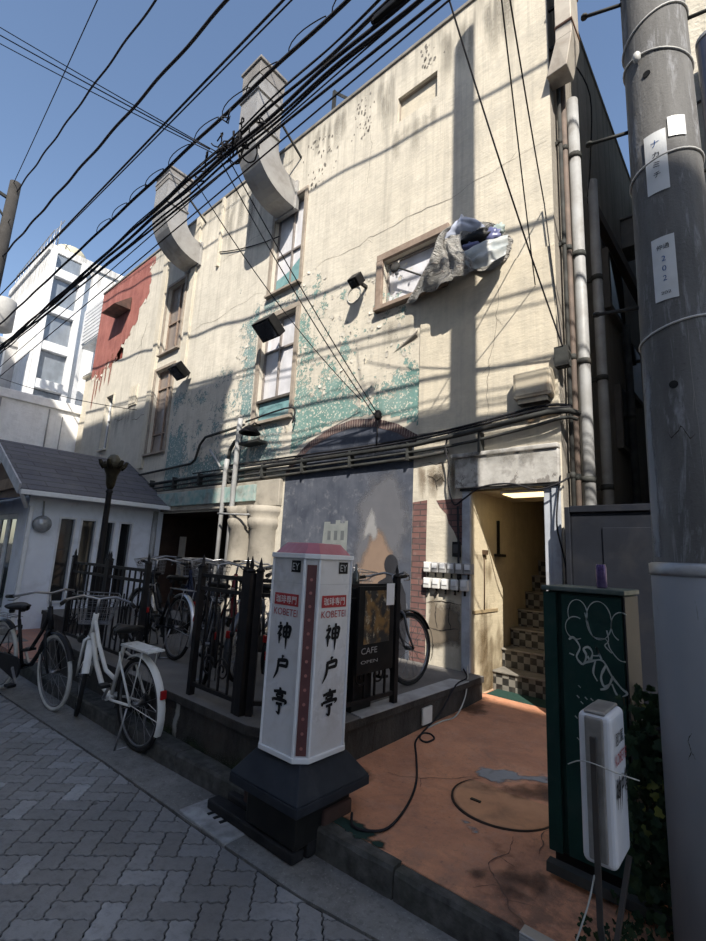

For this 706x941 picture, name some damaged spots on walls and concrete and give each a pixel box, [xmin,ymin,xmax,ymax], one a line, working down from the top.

peeling [91,256,156,406]
peeling [163,261,419,490]
crack [485,283,504,409]